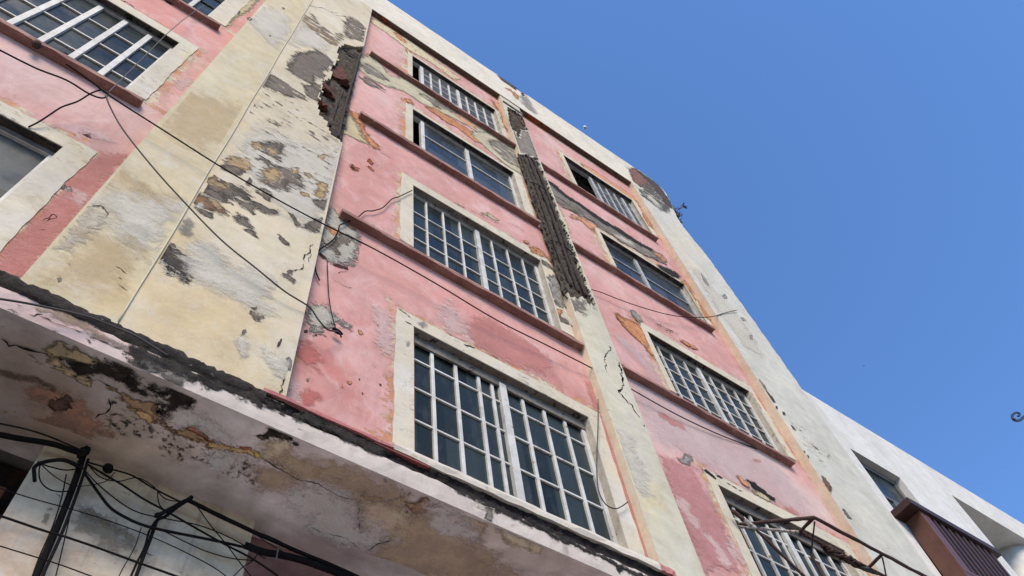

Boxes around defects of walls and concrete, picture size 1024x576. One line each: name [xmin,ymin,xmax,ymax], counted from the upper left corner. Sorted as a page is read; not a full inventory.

spalling [53,13,679,326]
spalling [42,341,110,387]
damp [36,307,388,456]
crack [604,350,639,416]
damp [106,413,213,464]
spalling [96,385,339,483]
crack [261,457,358,501]
spalling [736,475,776,502]
spalling [356,491,439,541]